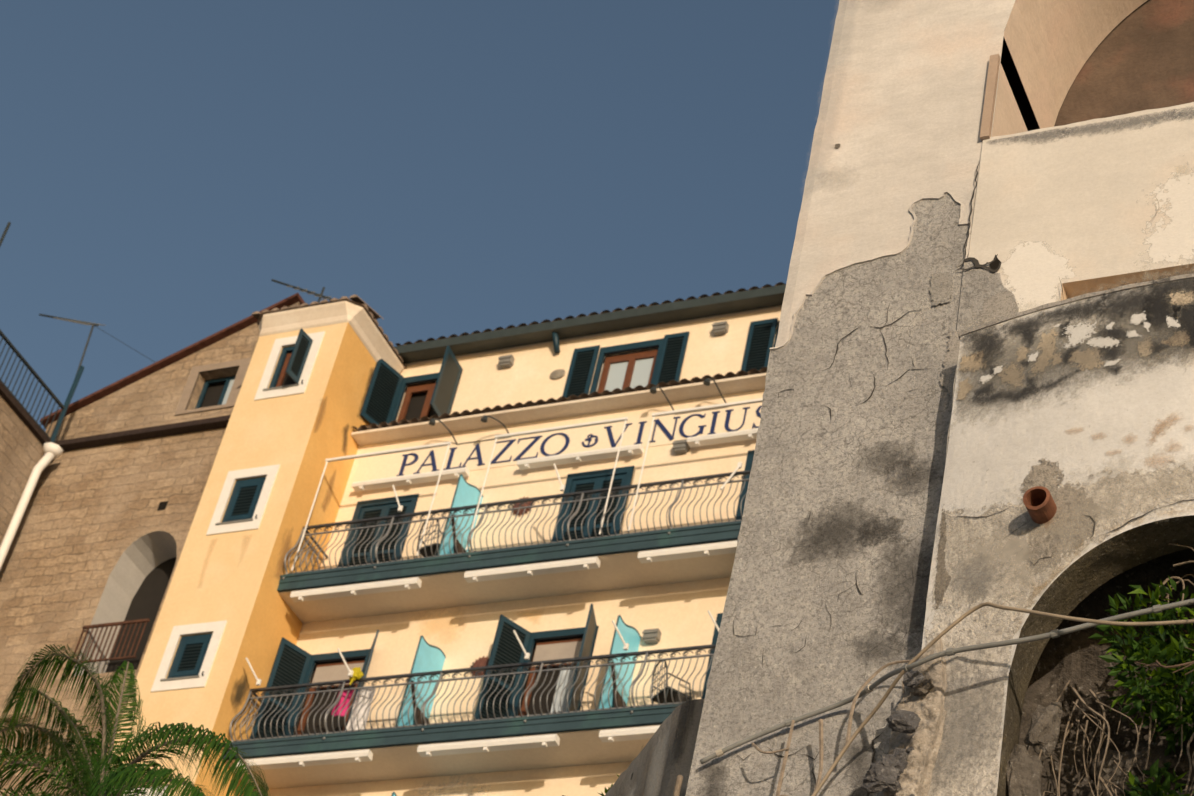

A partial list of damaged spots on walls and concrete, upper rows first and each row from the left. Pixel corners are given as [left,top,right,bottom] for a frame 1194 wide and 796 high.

crack [778,304,926,421]
leakage [798,506,898,558]
leakage [890,549,930,628]
flaking render [685,188,1194,796]